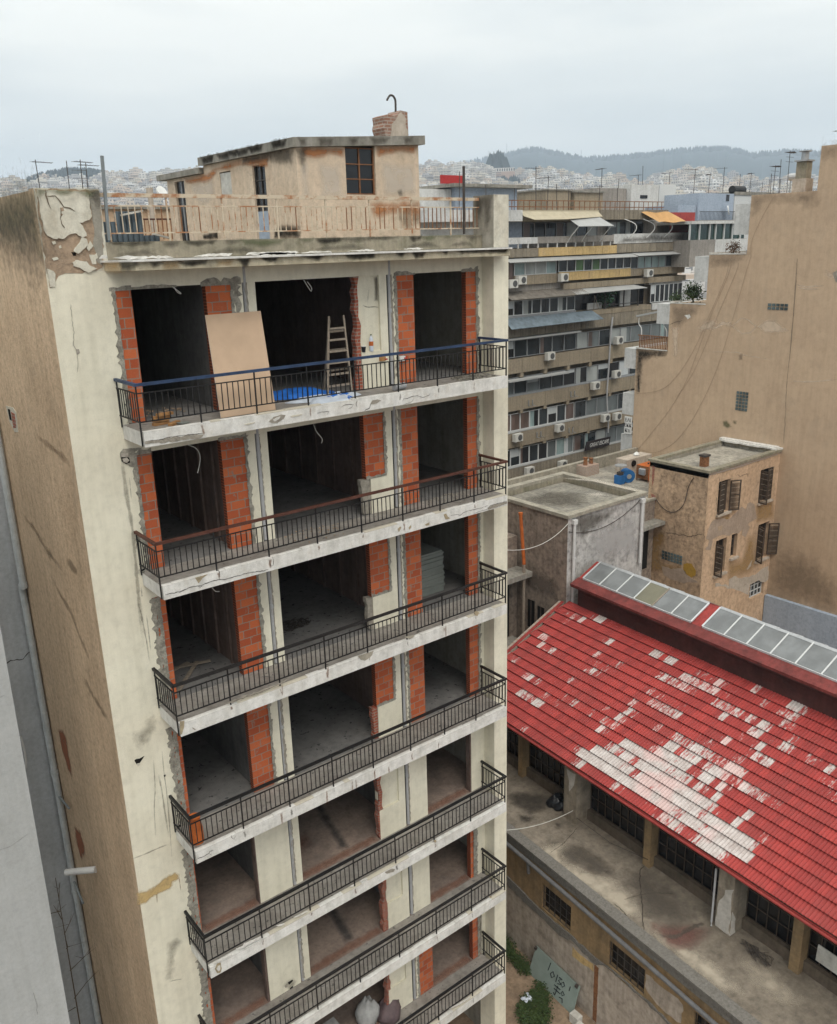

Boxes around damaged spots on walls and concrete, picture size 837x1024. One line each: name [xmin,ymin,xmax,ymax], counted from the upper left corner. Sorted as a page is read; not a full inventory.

peeling [35,188,174,288]
peeling [715,890,736,936]